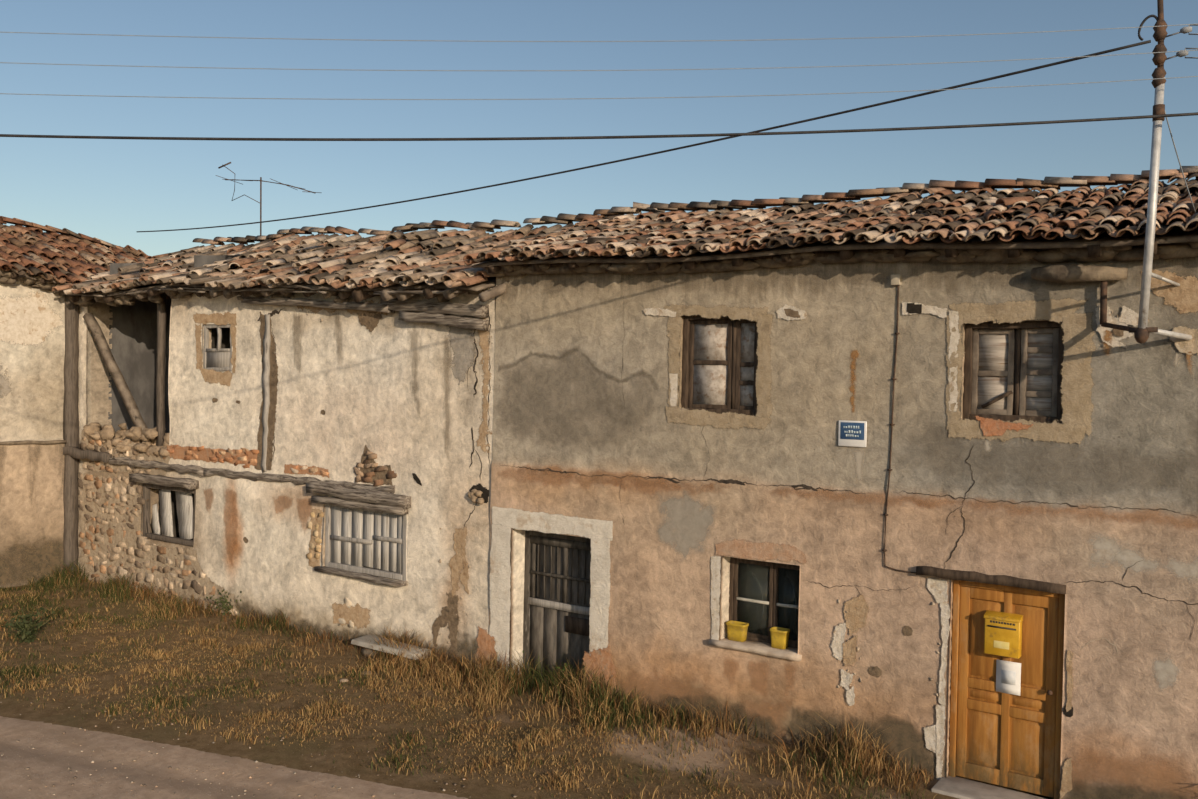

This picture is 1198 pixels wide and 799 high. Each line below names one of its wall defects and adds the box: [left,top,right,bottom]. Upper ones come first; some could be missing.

spalling [1095,305,1150,348]
spalling [1141,268,1198,365]
crack [467,302,865,522]
spalling [975,416,1033,451]
crack [895,444,1198,564]
spalling [332,597,371,629]
flaking render [432,526,499,668]
flaking render [831,594,882,706]
flaking render [924,578,951,780]
crack [1067,560,1198,638]